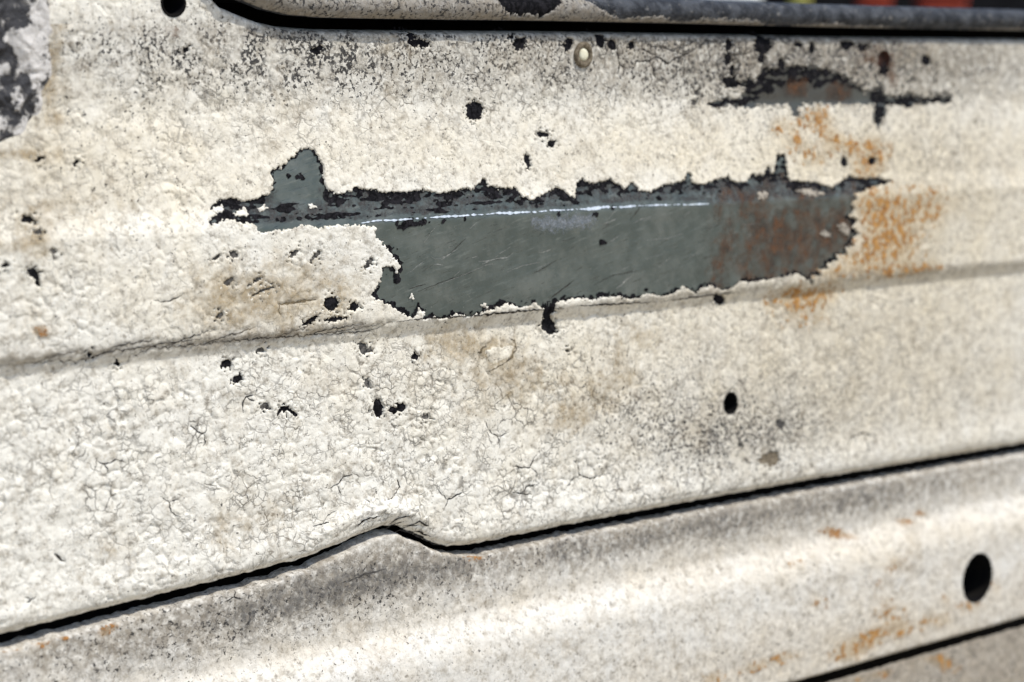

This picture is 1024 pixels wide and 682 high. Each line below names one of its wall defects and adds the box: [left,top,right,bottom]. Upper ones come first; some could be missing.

peeling [583,0,1024,130]
peeling [209,148,892,335]
rust [763,104,948,330]
crack [313,474,445,546]
crack [513,456,539,495]